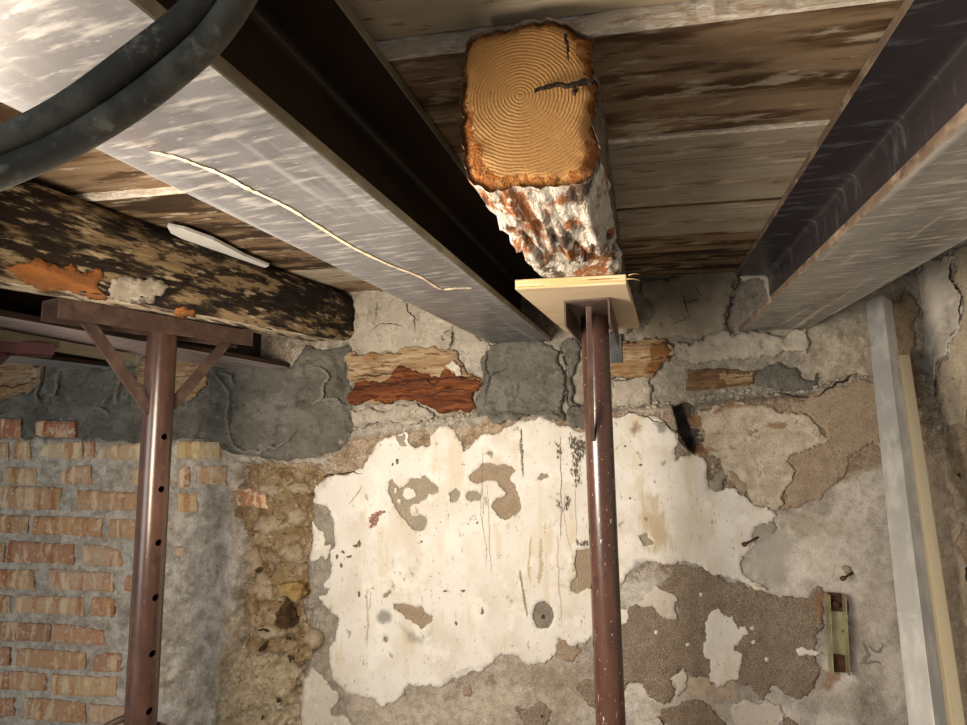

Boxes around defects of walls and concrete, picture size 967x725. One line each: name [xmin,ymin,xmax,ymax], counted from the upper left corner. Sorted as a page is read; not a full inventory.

flaking render [892,244,967,427]
crack [934,253,962,397]
flaking render [0,418,140,725]
flaking render [176,441,268,513]
flaking render [300,417,592,725]
spalling [613,379,880,725]
spalling [576,679,595,708]